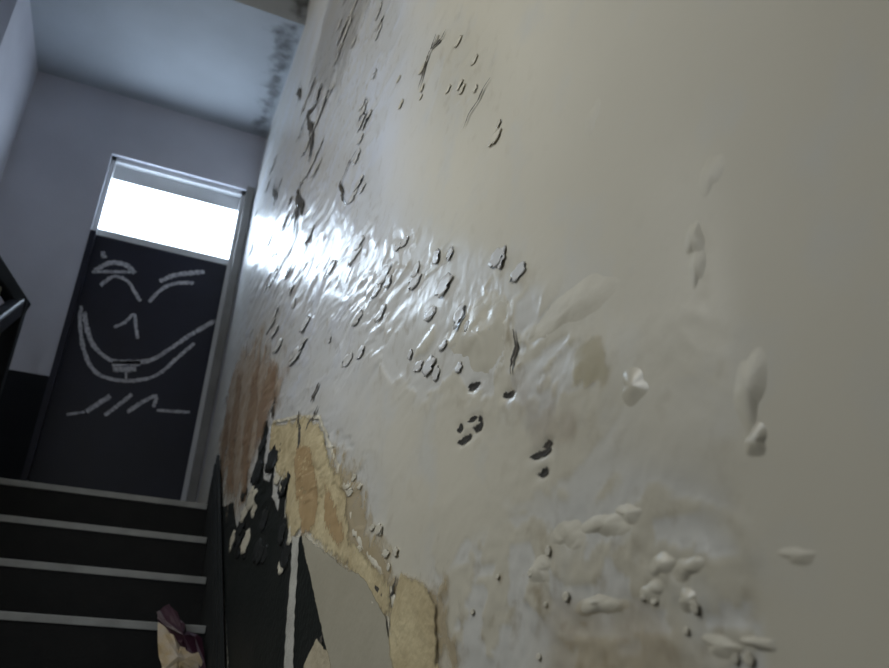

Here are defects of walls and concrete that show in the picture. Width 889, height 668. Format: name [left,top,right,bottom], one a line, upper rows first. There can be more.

flaking render [229,414,439,668]